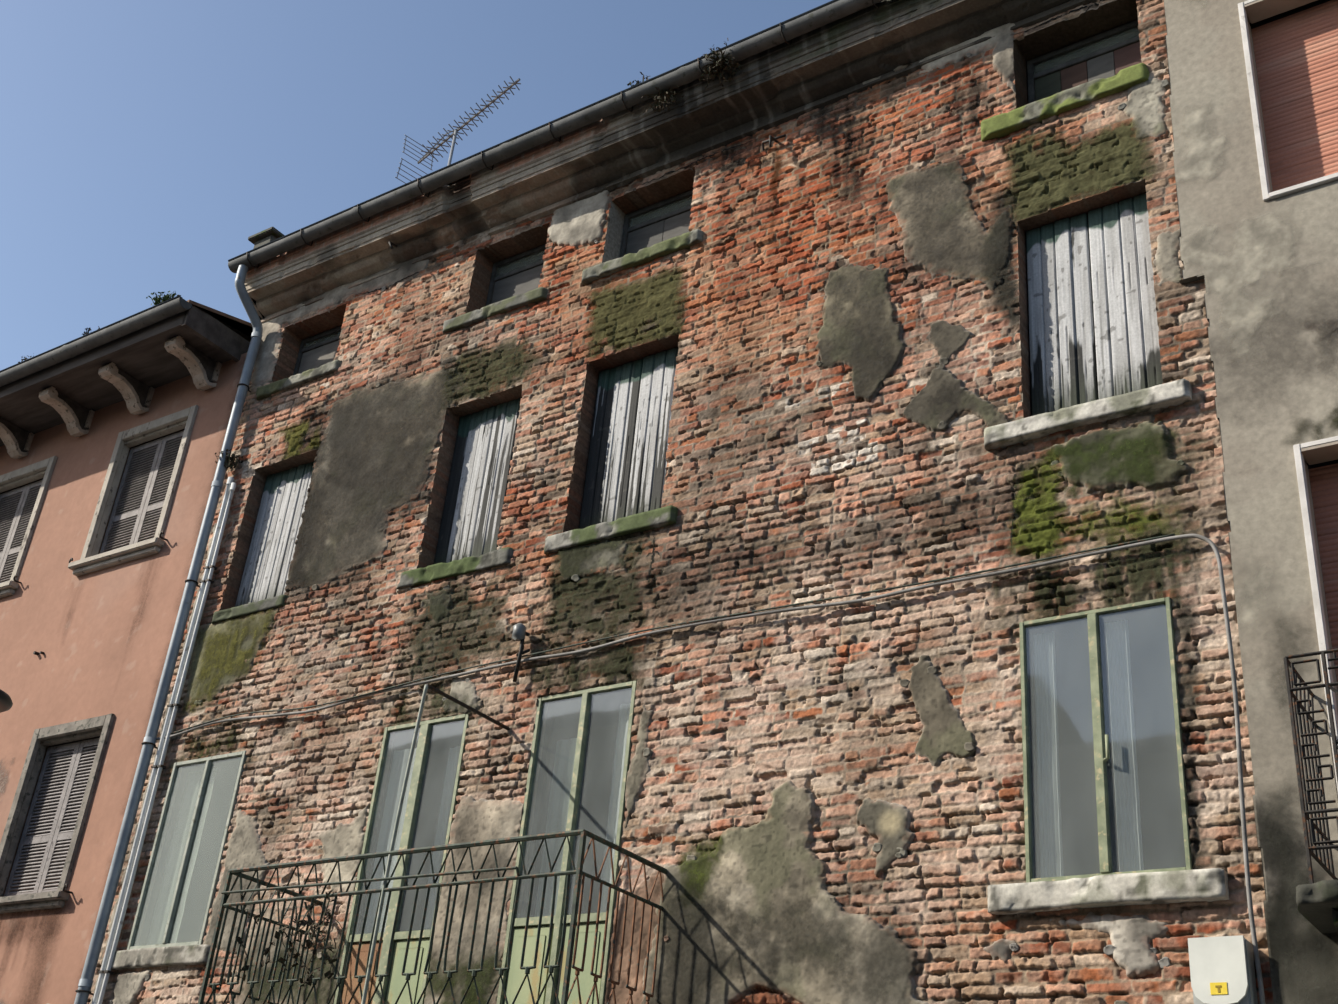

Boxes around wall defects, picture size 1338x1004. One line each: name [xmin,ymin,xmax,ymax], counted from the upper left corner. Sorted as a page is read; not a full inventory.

peeling [604,780,929,1004]
peeling [984,939,1019,963]
peeling [1050,911,1182,978]